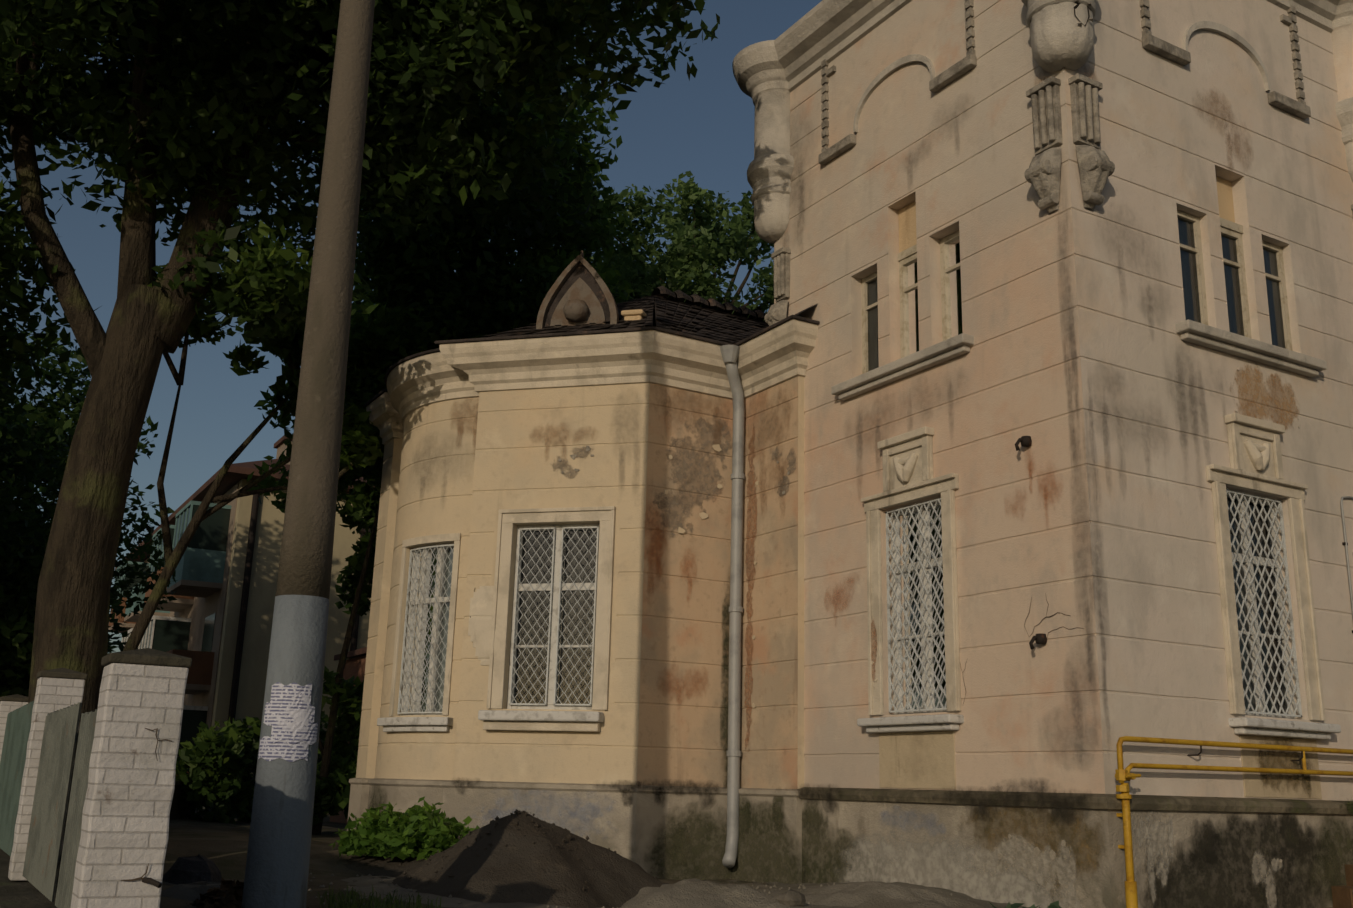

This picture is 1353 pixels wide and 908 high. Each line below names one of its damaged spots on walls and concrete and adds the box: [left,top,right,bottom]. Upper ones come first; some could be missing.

peeling [1235,367,1300,430]
peeling [553,445,594,478]
flaking render [656,418,730,537]
peeling [744,433,759,741]
crack [1024,598,1084,638]
damp [721,601,730,771]
damp [650,794,1099,908]
peeling [971,834,1080,908]
damp [1145,814,1353,908]